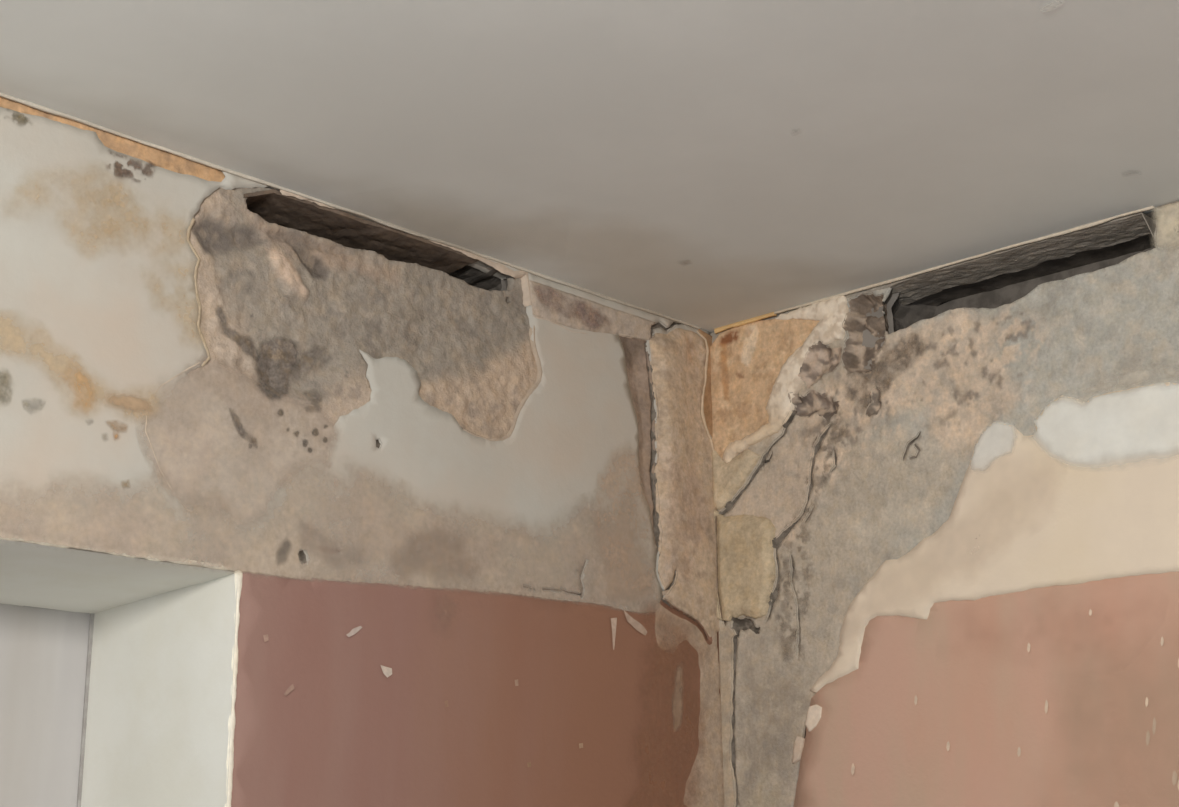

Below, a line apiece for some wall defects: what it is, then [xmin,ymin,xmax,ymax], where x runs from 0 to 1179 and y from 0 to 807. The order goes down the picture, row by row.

leakage [110,152,154,180]
leakage [231,411,256,448]
leakage [217,307,324,415]
flaking render [0,97,543,524]
leakage [287,425,327,452]
leakage [0,456,658,613]
crack [645,321,739,807]
crack [715,410,797,535]
crack [765,424,837,651]
spalling [611,203,1179,807]